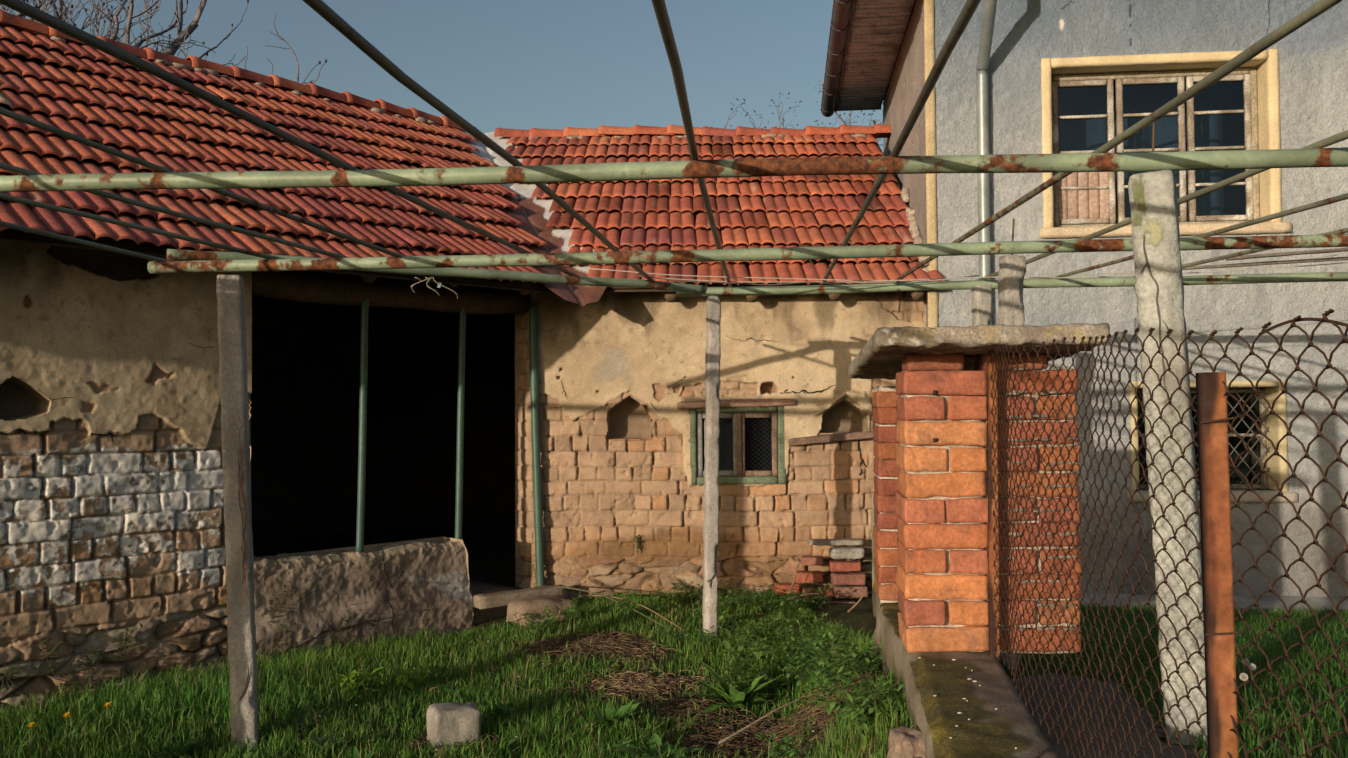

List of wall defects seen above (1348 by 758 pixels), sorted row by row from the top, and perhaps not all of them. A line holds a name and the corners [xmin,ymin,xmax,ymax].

crack [1139,235,1172,400]
flaking render [145,363,175,384]
flaking render [82,382,120,413]
flaking render [652,377,778,403]
crack [239,547,403,701]